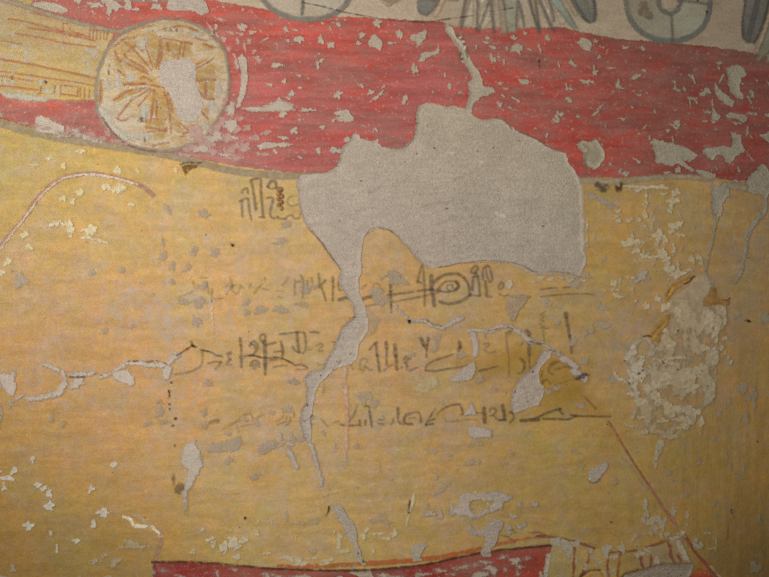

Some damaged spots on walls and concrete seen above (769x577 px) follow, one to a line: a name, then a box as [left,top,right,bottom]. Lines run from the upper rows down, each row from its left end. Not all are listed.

peeling [32,0,68,14]
flaking render [74,0,317,174]
flaking render [19,115,129,154]
peeling [102,166,126,193]
peeling [49,219,108,244]
flaking render [256,19,769,469]
crack [733,198,768,285]
crack [393,304,589,383]
flaking render [181,432,243,511]
peeling [201,519,272,571]
flaking render [415,476,539,577]
flaking render [624,563,693,577]